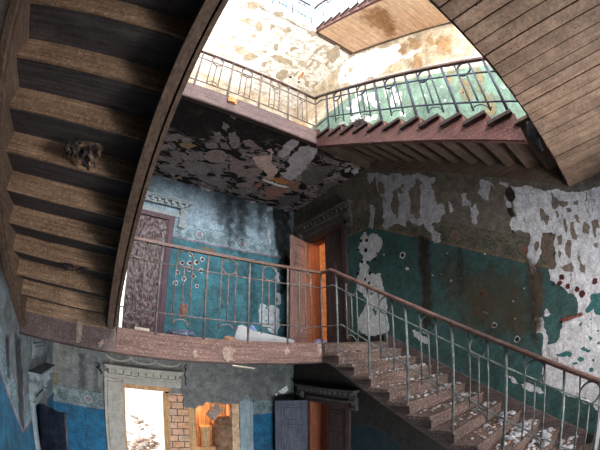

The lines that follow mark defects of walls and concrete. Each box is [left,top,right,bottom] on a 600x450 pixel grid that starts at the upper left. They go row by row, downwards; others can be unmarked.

damp [365,9,396,36]
flaking render [219,17,422,122]
flaking render [258,292,281,334]
flaking render [356,173,453,336]
damp [419,236,433,329]
flaking render [461,193,479,225]
flaking render [477,179,600,410]